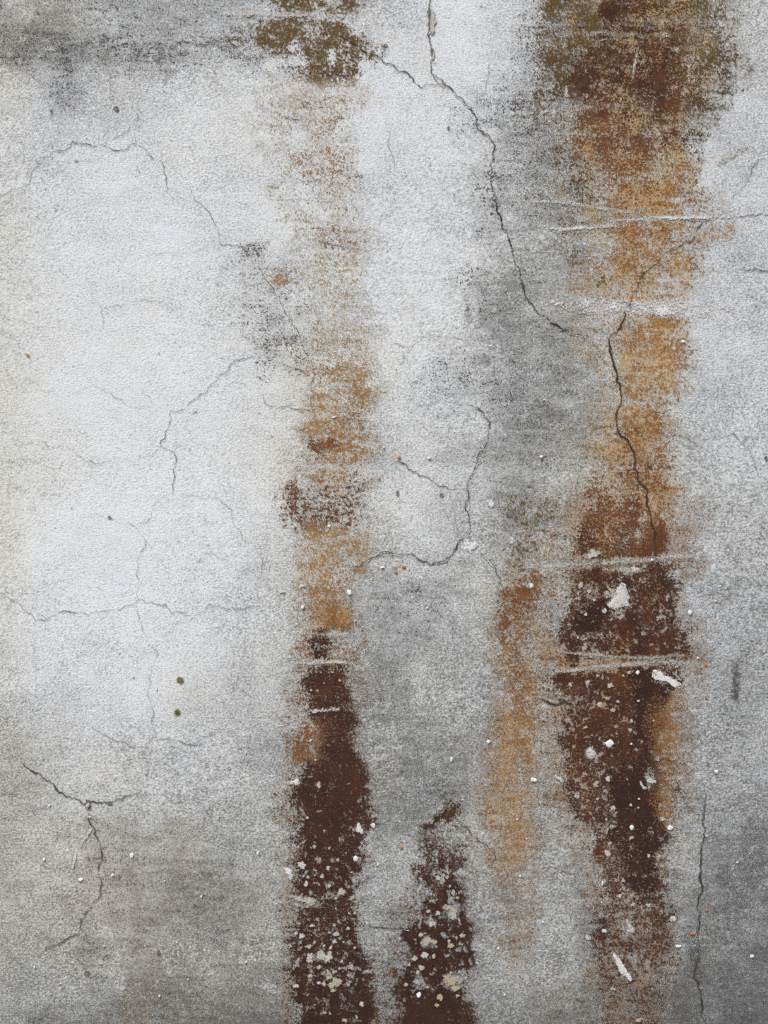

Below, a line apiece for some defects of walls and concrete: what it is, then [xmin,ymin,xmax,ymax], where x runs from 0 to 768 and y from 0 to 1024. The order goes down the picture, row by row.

crack [9,342,279,749]
crack [2,20,316,419]
rust [219,0,754,1024]
crack [339,0,735,638]
crack [2,761,228,957]